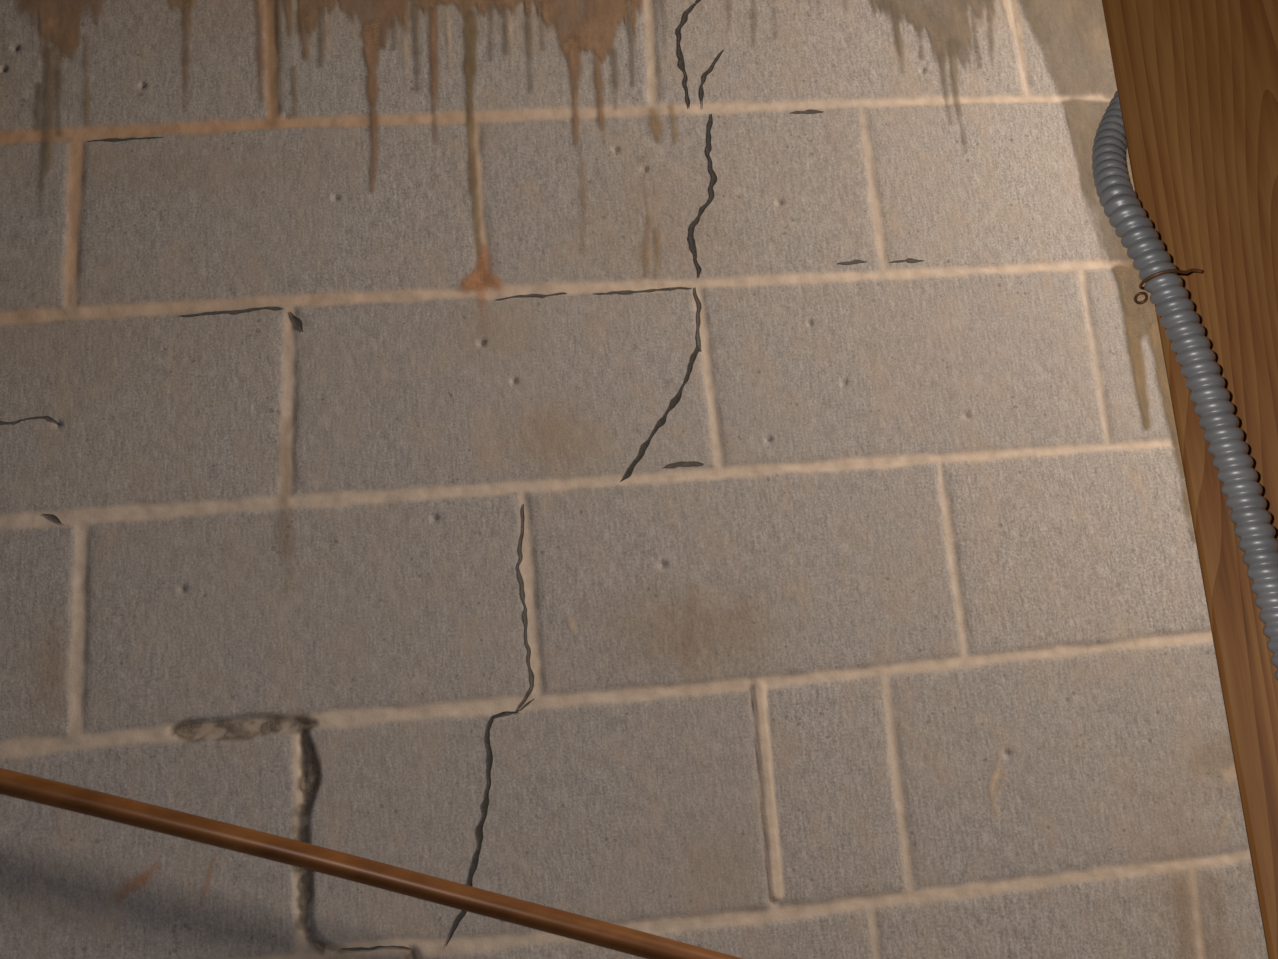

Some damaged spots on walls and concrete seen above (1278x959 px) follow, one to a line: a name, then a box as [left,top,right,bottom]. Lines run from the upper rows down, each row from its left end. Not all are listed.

damp [20,0,102,55]
damp [285,0,642,284]
crack [621,0,724,482]
damp [871,0,1006,110]
damp [1018,0,1190,514]
crack [0,416,60,425]
crack [446,504,535,946]